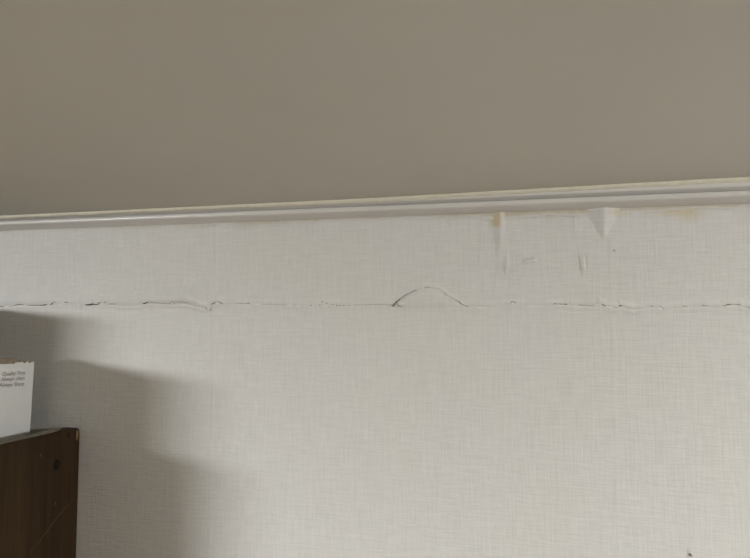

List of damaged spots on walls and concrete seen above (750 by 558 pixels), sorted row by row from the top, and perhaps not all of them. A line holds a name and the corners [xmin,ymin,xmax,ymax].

crack [0,285,395,313]
crack [463,297,750,315]